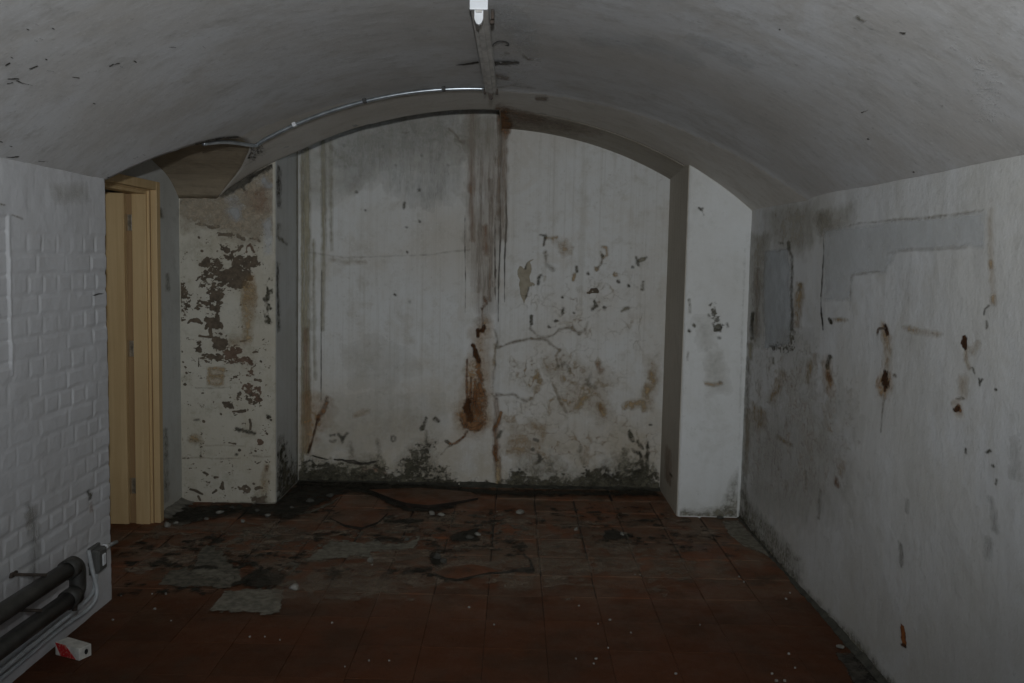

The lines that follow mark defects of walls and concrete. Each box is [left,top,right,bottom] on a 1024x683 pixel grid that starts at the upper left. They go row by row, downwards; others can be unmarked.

peeling [181,223,273,503]
leakage [277,141,460,499]
corrosion [456,297,490,432]
spalling [517,259,542,302]
corrosion [876,324,896,410]
crack [445,431,468,447]
leakage [485,394,659,488]